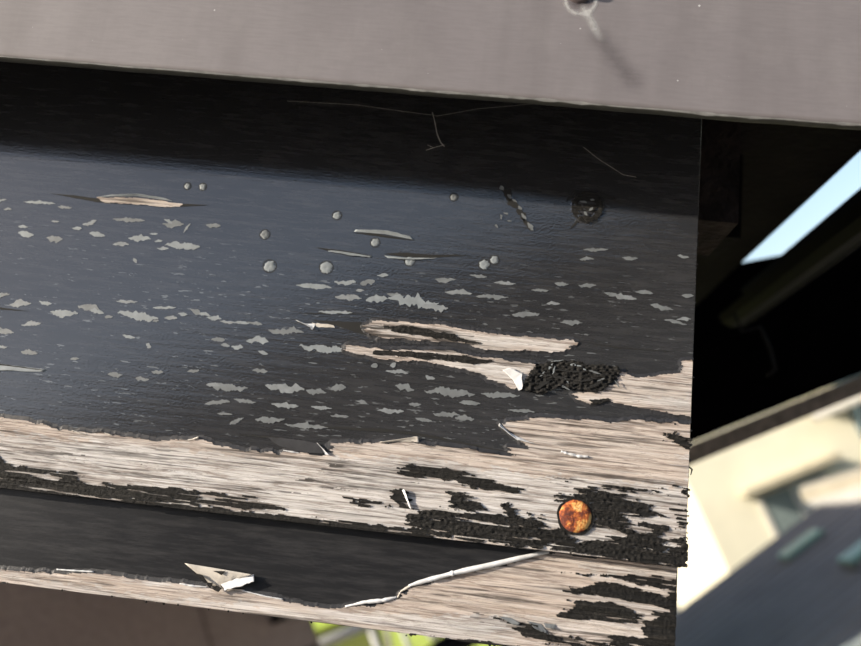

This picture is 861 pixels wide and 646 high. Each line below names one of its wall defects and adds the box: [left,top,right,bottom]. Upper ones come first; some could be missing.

peeling [25,200,72,209]
peeling [72,220,105,237]
peeling [113,219,200,250]
peeling [0,273,694,646]